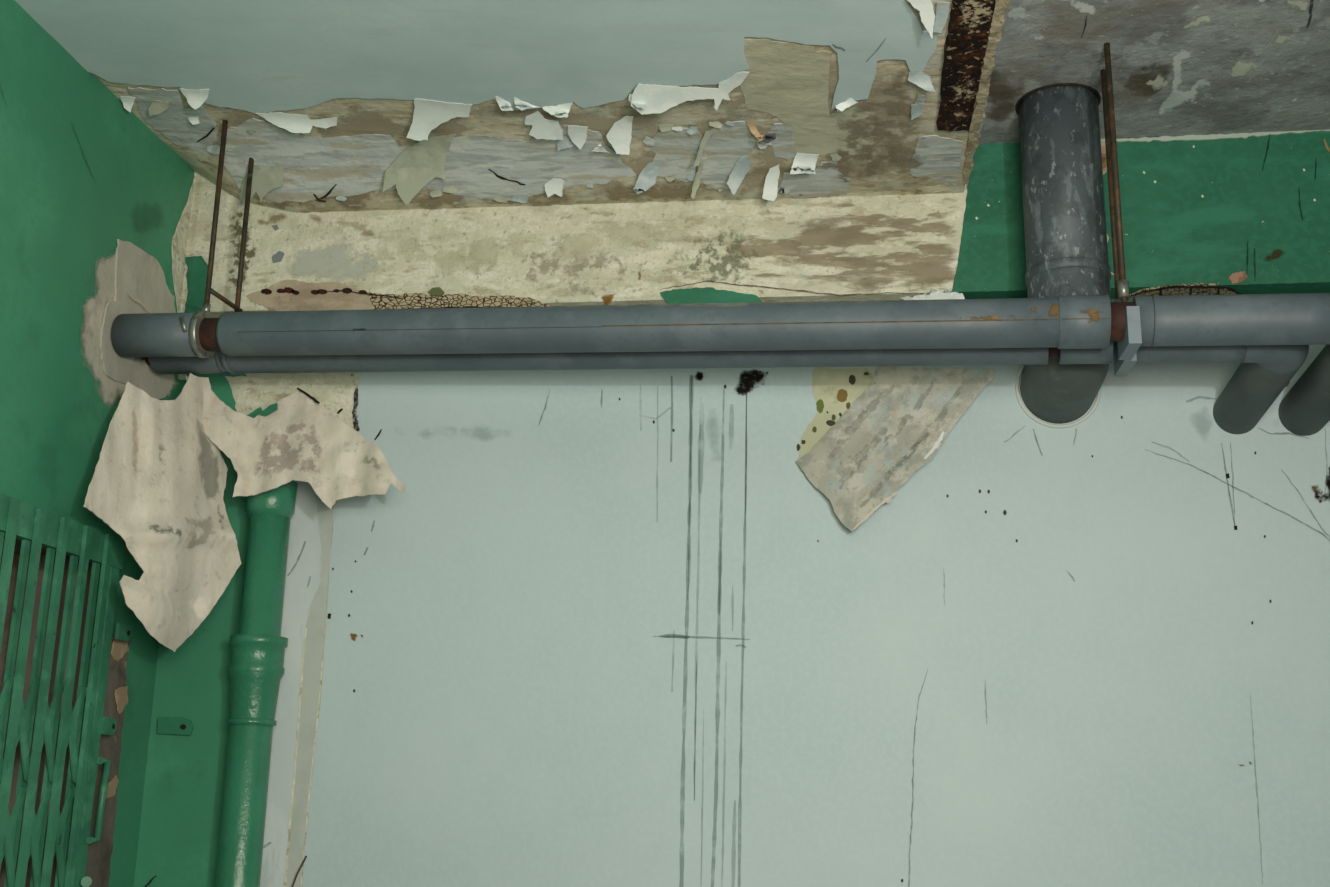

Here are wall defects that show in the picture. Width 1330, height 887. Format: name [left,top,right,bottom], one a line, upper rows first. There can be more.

peeling [120,0,1010,205]
leakage [323,192,369,210]
leakage [419,194,463,210]
leakage [509,193,567,206]
leakage [609,184,706,200]
peeling [172,175,195,313]
leakage [511,203,955,292]
peeling [225,376,356,430]
peeling [797,367,876,459]